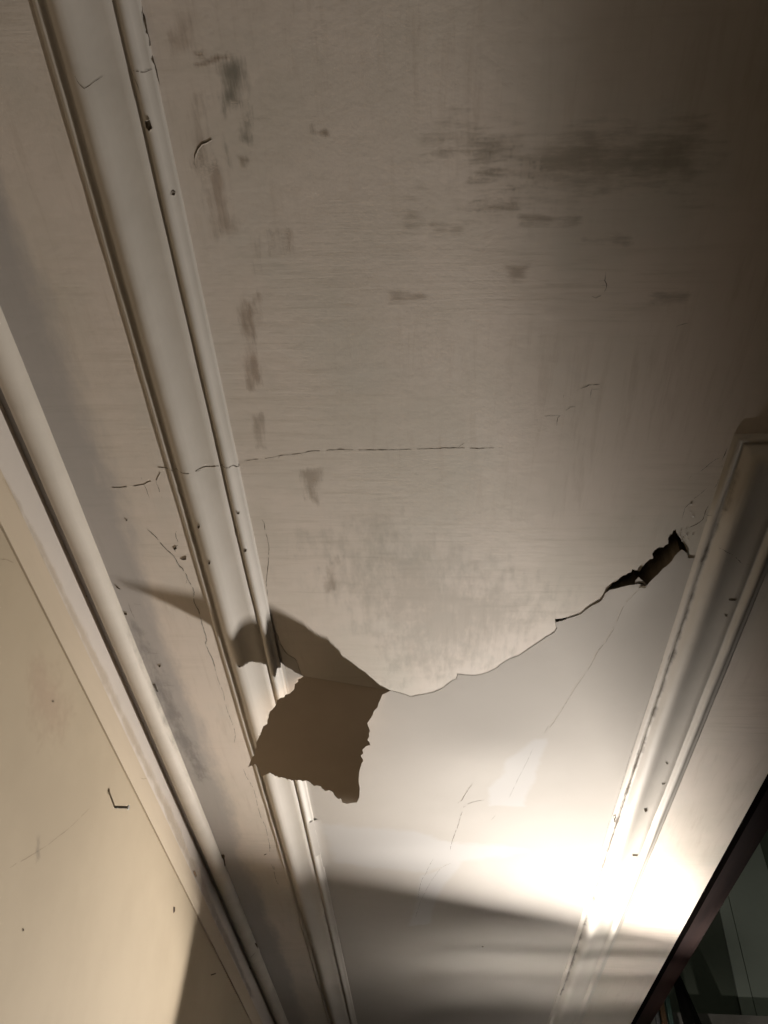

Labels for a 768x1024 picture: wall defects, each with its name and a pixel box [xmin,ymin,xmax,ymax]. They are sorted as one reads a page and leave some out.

crack [112,449,344,496]
peeling [248,676,389,804]